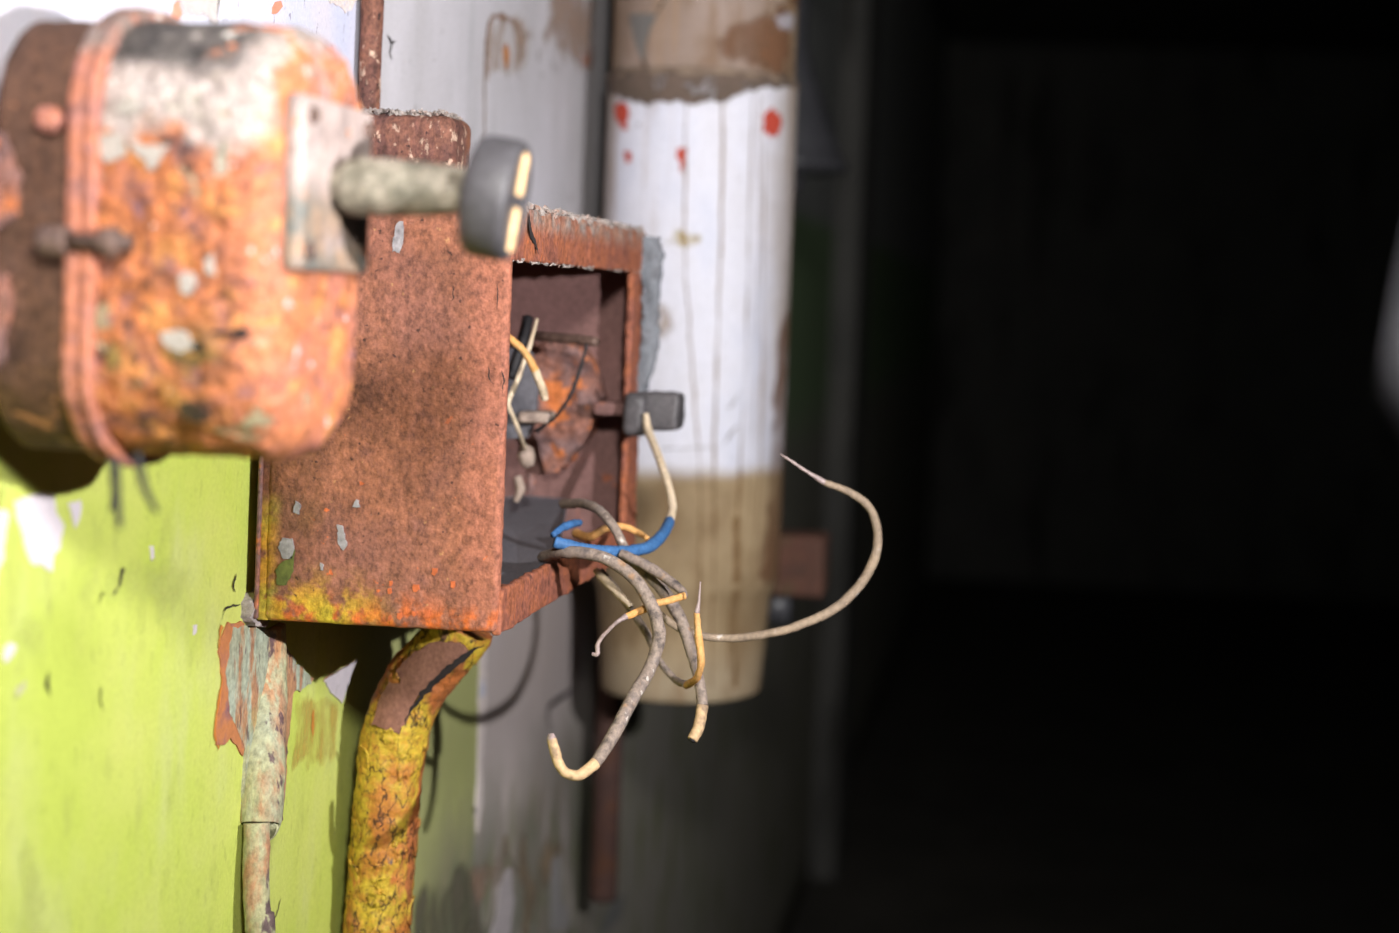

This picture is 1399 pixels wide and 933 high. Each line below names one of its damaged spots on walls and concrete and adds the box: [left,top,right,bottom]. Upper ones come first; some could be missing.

peeling [272,1,283,14]
peeling [329,0,361,13]
spalling [628,0,665,76]
peeling [0,492,82,572]
peeling [225,625,269,798]
peeling [282,648,358,821]